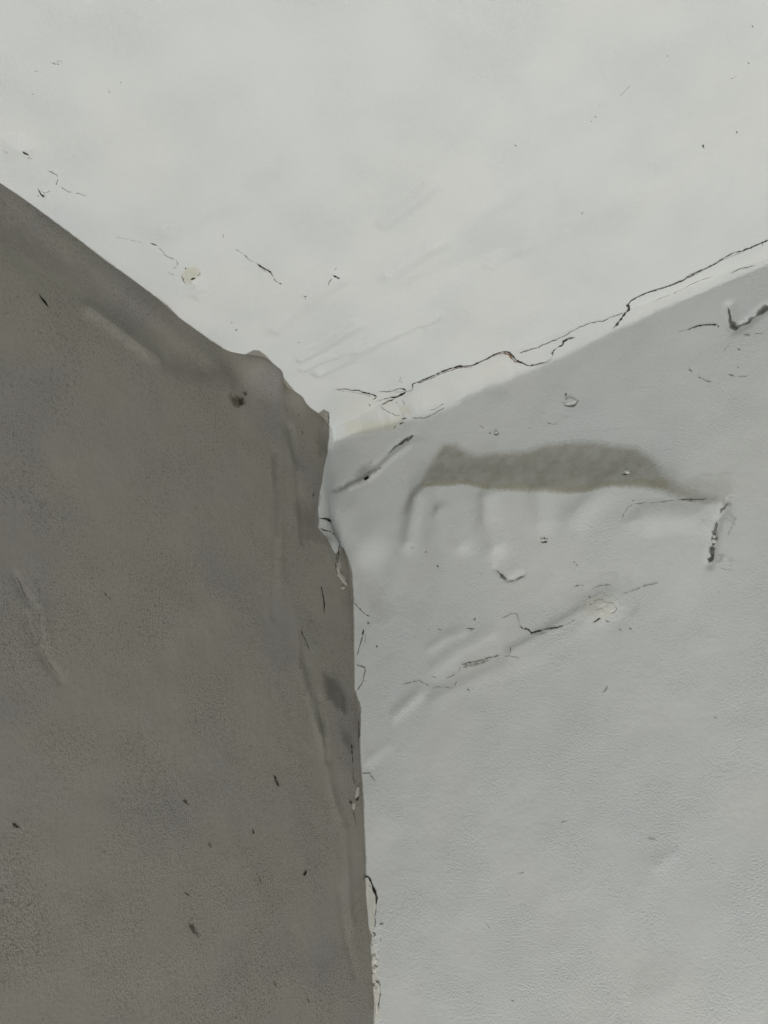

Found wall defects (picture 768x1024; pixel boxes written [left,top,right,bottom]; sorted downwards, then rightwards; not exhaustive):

crack [336,240,768,428]
damp [398,439,740,517]
crack [405,613,563,688]
peeling [365,877,384,1024]